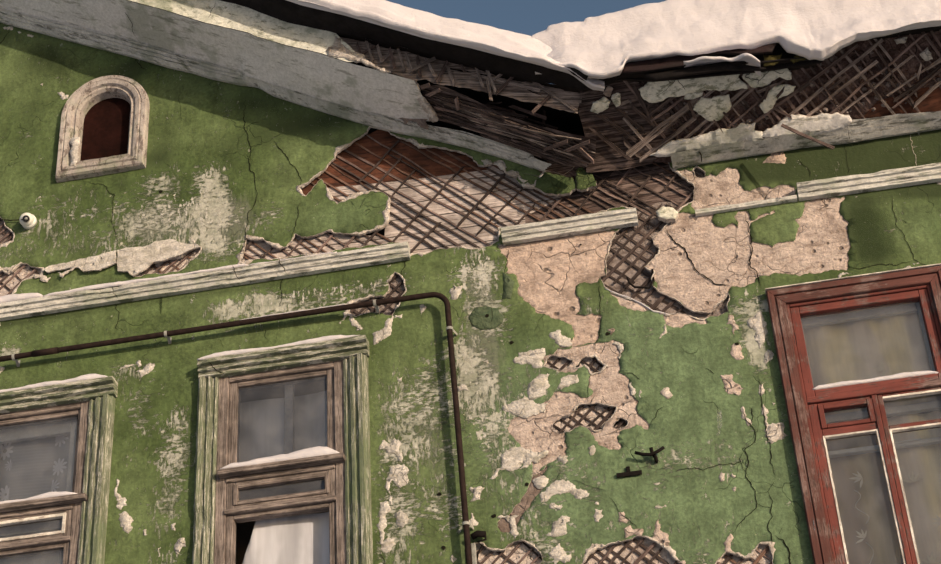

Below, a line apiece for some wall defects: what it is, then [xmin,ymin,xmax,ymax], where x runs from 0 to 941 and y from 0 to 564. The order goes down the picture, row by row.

spalling [326,36,391,73]
spalling [399,81,439,130]
flaking render [0,218,15,248]
flaking render [0,262,75,296]
flaking render [134,237,202,277]
crack [665,228,729,286]
crack [745,211,761,286]
crack [853,200,926,269]
flaking render [236,126,851,564]
crack [677,378,791,564]